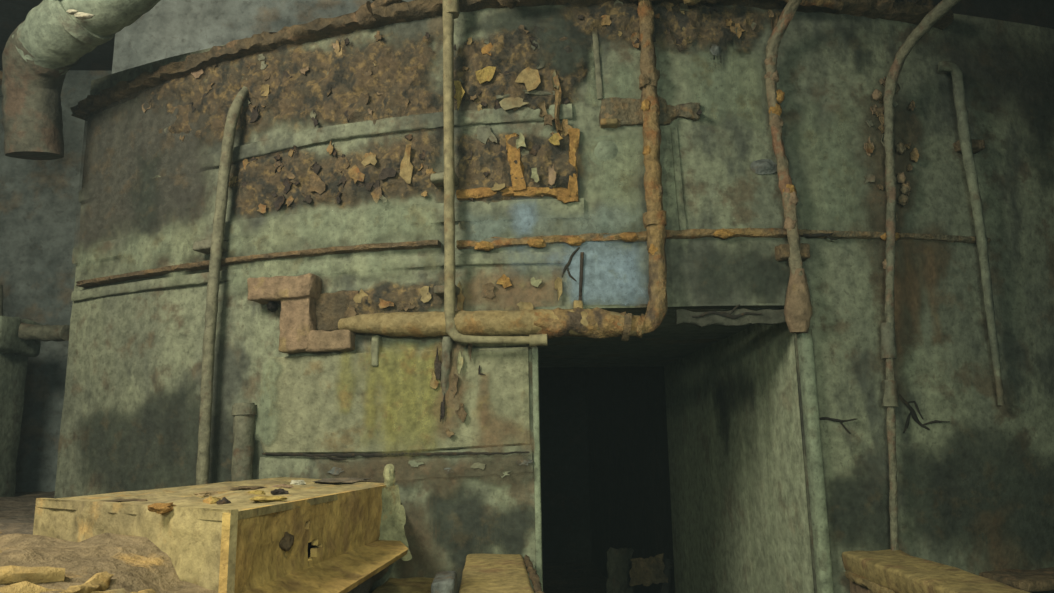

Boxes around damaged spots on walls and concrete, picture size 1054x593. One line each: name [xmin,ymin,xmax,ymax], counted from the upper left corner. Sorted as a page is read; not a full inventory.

corrosion [141,25,586,142]
corrosion [229,128,443,217]
corrosion [454,119,580,203]
crack [562,247,580,281]
corrosion [864,78,947,363]
water stain [83,391,233,493]
peeling [430,344,473,438]
water stain [709,333,814,593]
crack [819,417,857,434]
water stain [828,473,890,548]
crack [898,394,950,433]
water stain [908,429,1054,561]